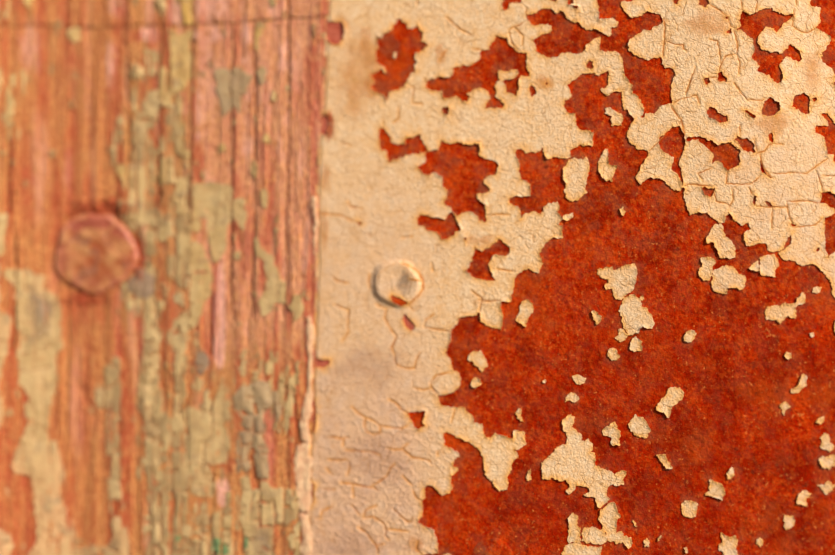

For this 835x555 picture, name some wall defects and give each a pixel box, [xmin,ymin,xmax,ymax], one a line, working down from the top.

peeling [370,18,428,101]
crack [648,0,764,154]
peeling [379,128,499,241]
crack [685,126,835,228]
peeling [107,0,330,555]
peeling [390,295,415,330]
crack [368,274,449,393]
crack [402,263,450,332]
peeling [418,0,835,555]
peeling [0,268,131,555]
crack [298,400,438,555]
peeling [407,411,426,430]